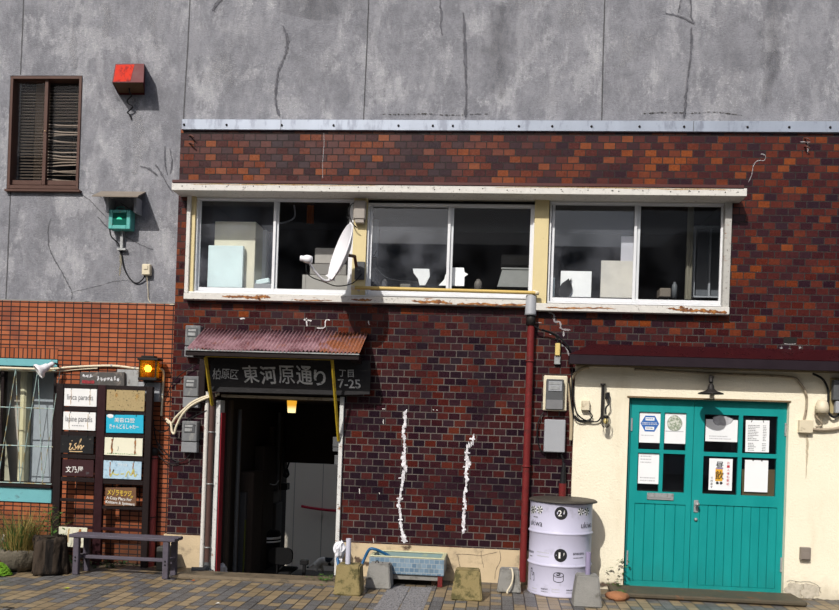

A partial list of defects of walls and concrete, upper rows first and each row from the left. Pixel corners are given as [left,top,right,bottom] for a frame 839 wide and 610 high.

crack [437,0,445,34]
crack [274,26,289,116]
crack [461,13,469,117]
crack [666,0,695,118]
crack [140,146,173,192]
crack [48,219,129,299]
corrosion [668,305,727,314]